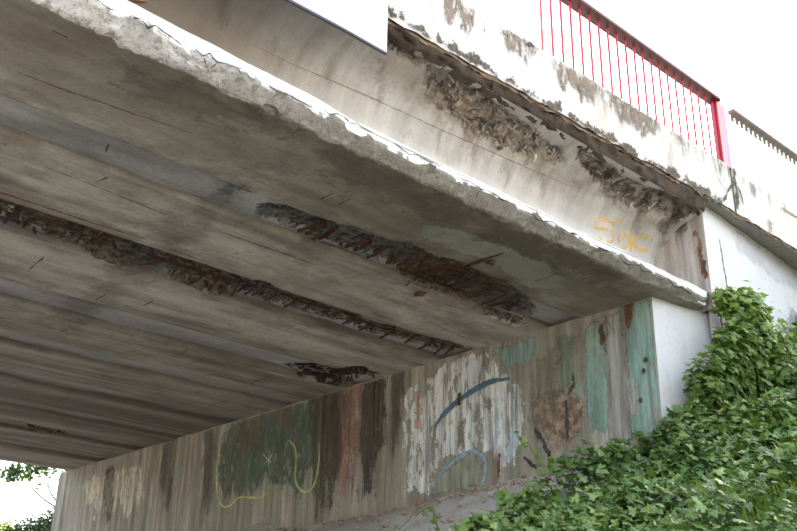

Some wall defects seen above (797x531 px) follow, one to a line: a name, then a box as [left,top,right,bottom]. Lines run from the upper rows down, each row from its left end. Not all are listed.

spalling [387,39,563,166]
peeling [553,63,596,106]
peeling [613,96,658,137]
spalling [578,149,693,224]
peeling [0,199,609,500]
peeling [619,300,660,441]
peeling [79,462,153,521]
leakage [309,390,344,518]
leakage [357,377,388,498]